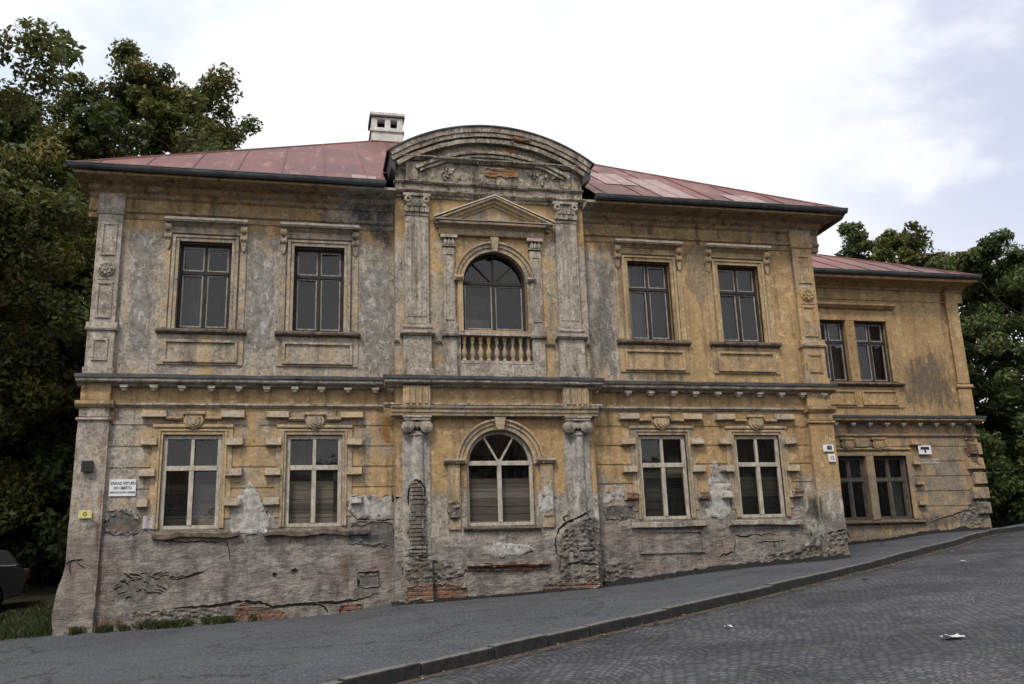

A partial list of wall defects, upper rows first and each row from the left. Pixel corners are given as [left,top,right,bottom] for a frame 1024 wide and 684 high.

damp [907,353,954,404]
peeling [697,460,733,519]
peeling [101,508,141,538]
spalling [347,479,639,603]
crack [554,509,595,553]
spalling [763,529,851,563]
crack [931,510,963,522]
crack [172,571,204,580]
peeling [110,570,286,629]
crack [170,592,379,613]